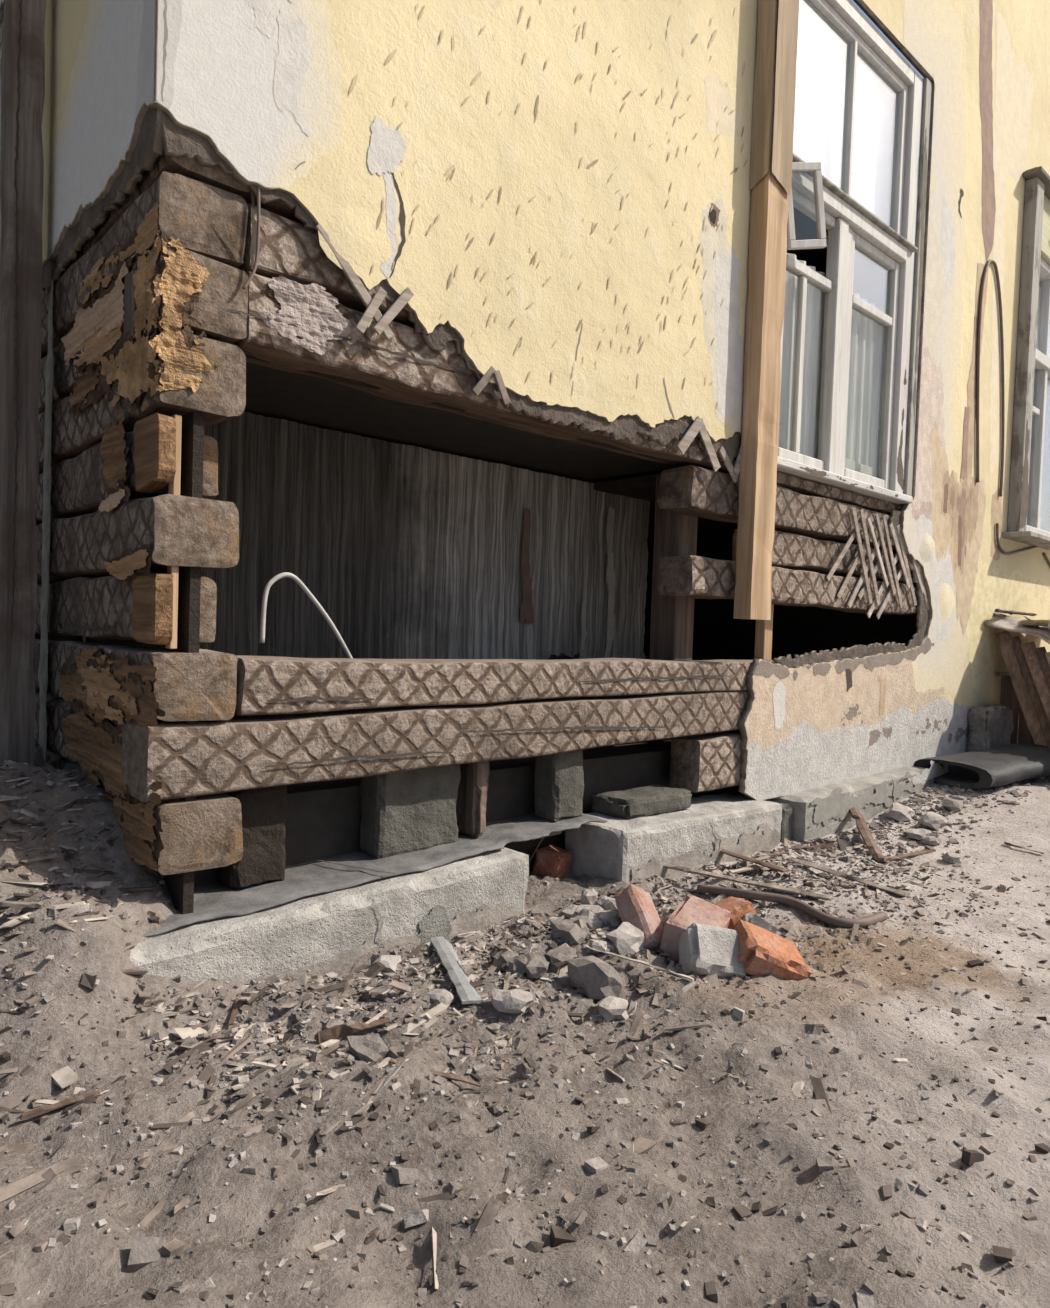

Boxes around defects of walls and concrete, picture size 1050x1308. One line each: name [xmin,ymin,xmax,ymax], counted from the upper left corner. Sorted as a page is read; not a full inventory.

crack [160,0,168,102]
spalling [266,276,352,355]
spalling [367,114,741,463]
damp [930,0,1002,635]